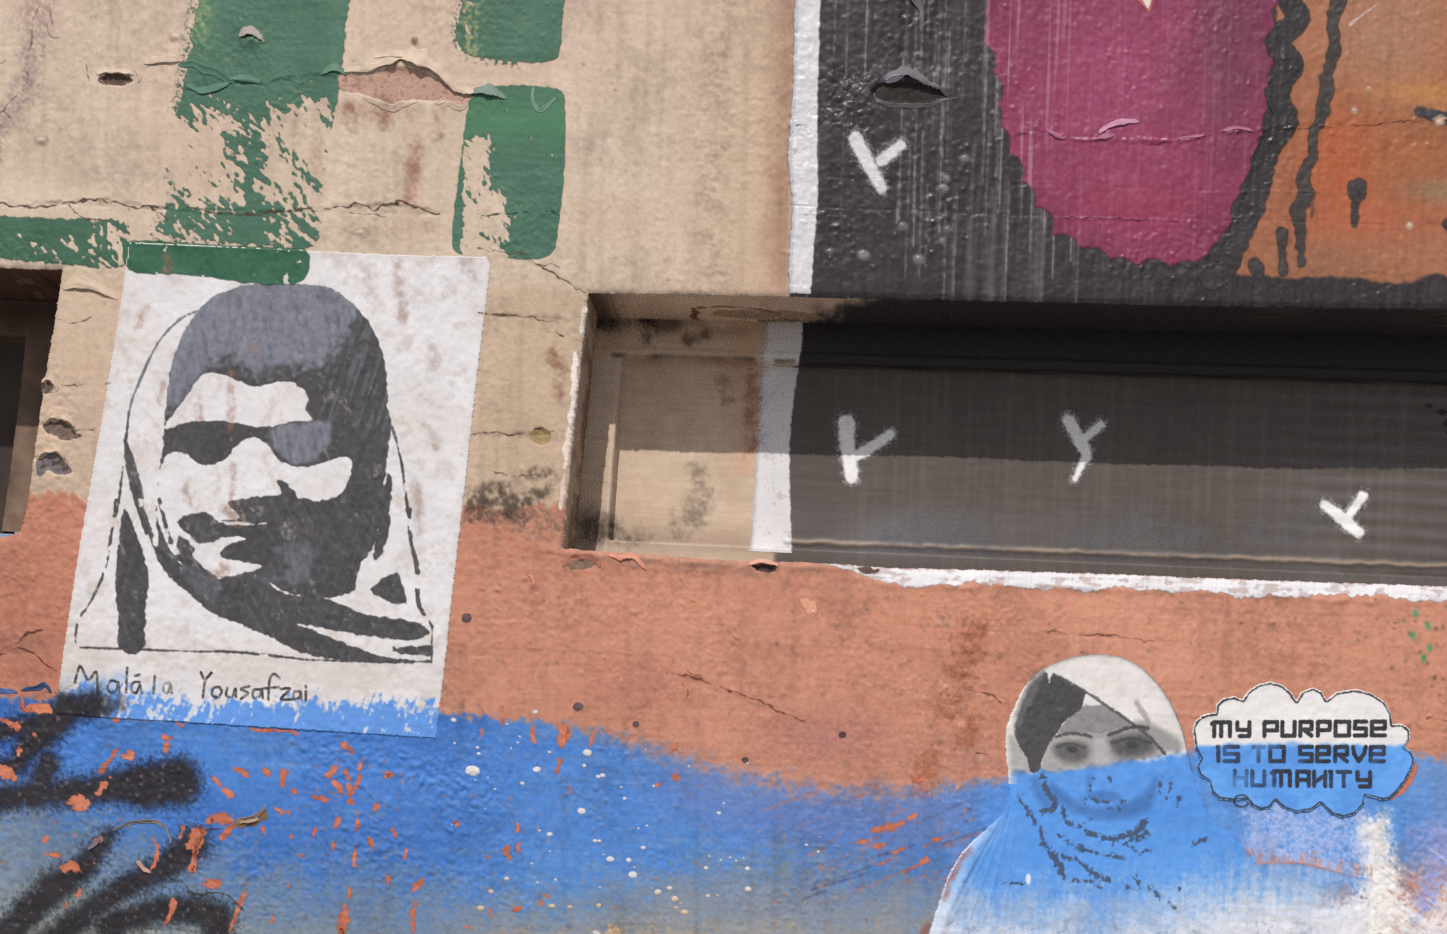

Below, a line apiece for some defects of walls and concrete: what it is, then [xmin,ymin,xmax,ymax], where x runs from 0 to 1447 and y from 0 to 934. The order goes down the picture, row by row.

spalling [96,66,143,86]
peeling [178,60,262,94]
peeling [322,46,506,113]
crack [0,198,440,221]
spalling [42,374,59,394]
spalling [36,411,81,476]